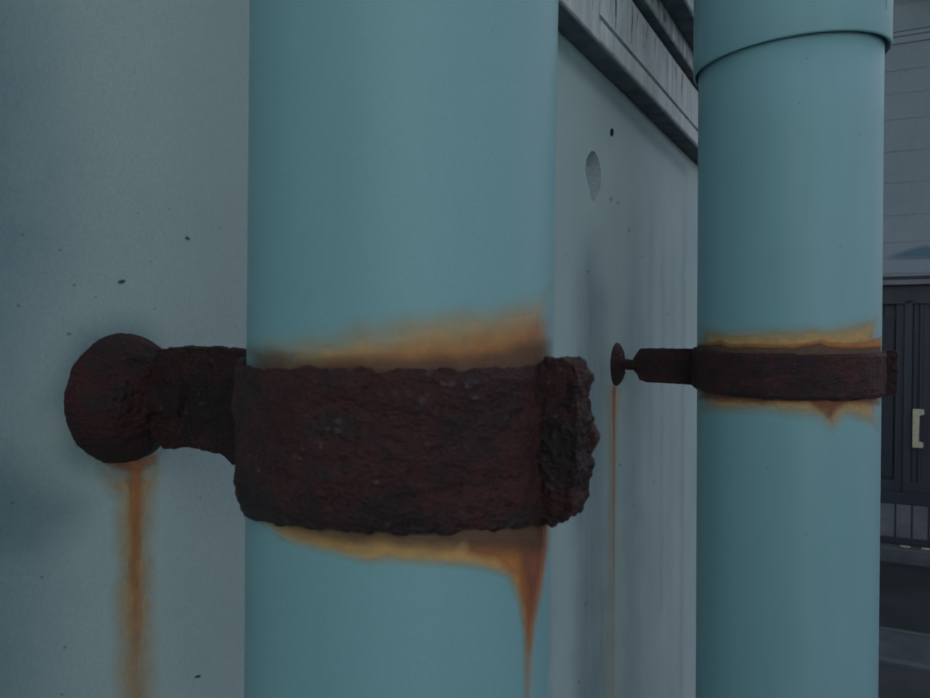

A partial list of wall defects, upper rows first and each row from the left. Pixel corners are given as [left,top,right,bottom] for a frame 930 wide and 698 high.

spalling [585,151,601,201]
rust [254,317,545,372]
rust [697,324,882,355]
rust [701,391,877,421]
rust [112,457,156,654]
rust [270,523,546,641]